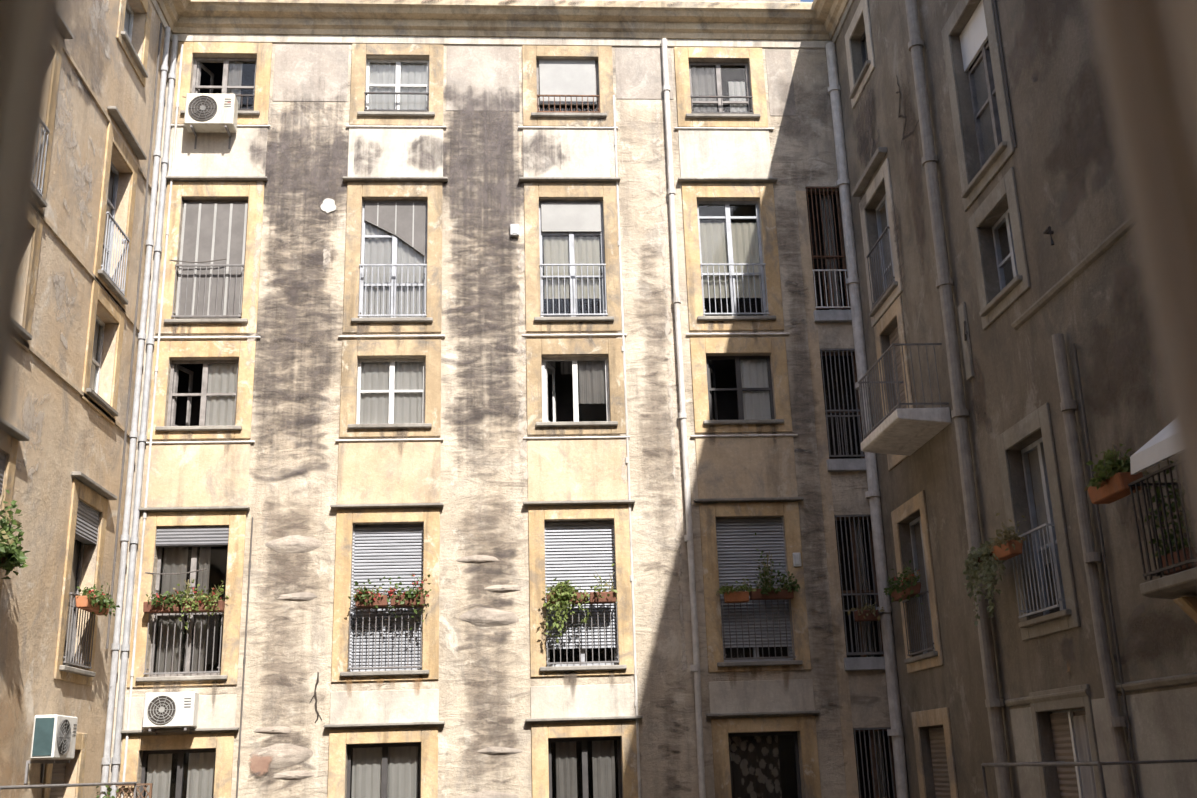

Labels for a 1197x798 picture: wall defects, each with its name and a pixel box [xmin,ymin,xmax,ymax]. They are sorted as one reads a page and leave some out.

leakage [251,97,380,448]
leakage [412,87,564,450]
leakage [267,503,309,537]
leakage [468,504,512,597]
leakage [264,606,299,710]
crack [310,672,322,723]